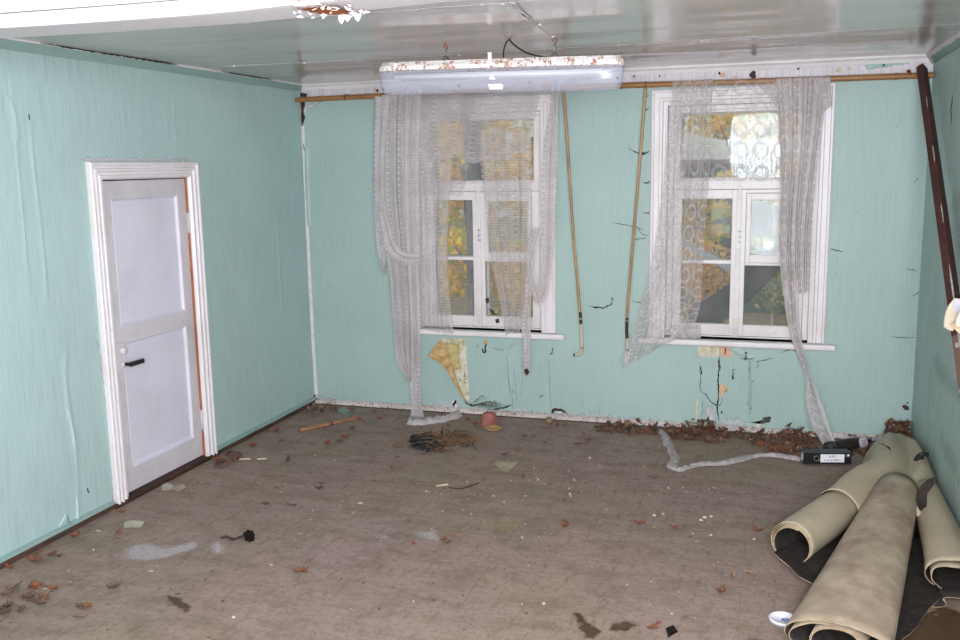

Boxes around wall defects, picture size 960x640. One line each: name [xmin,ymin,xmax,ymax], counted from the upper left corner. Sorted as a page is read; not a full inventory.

peeling [293,4,370,24]
flaking render [429,338,470,408]
crack [699,357,773,421]
water stain [903,607,960,640]